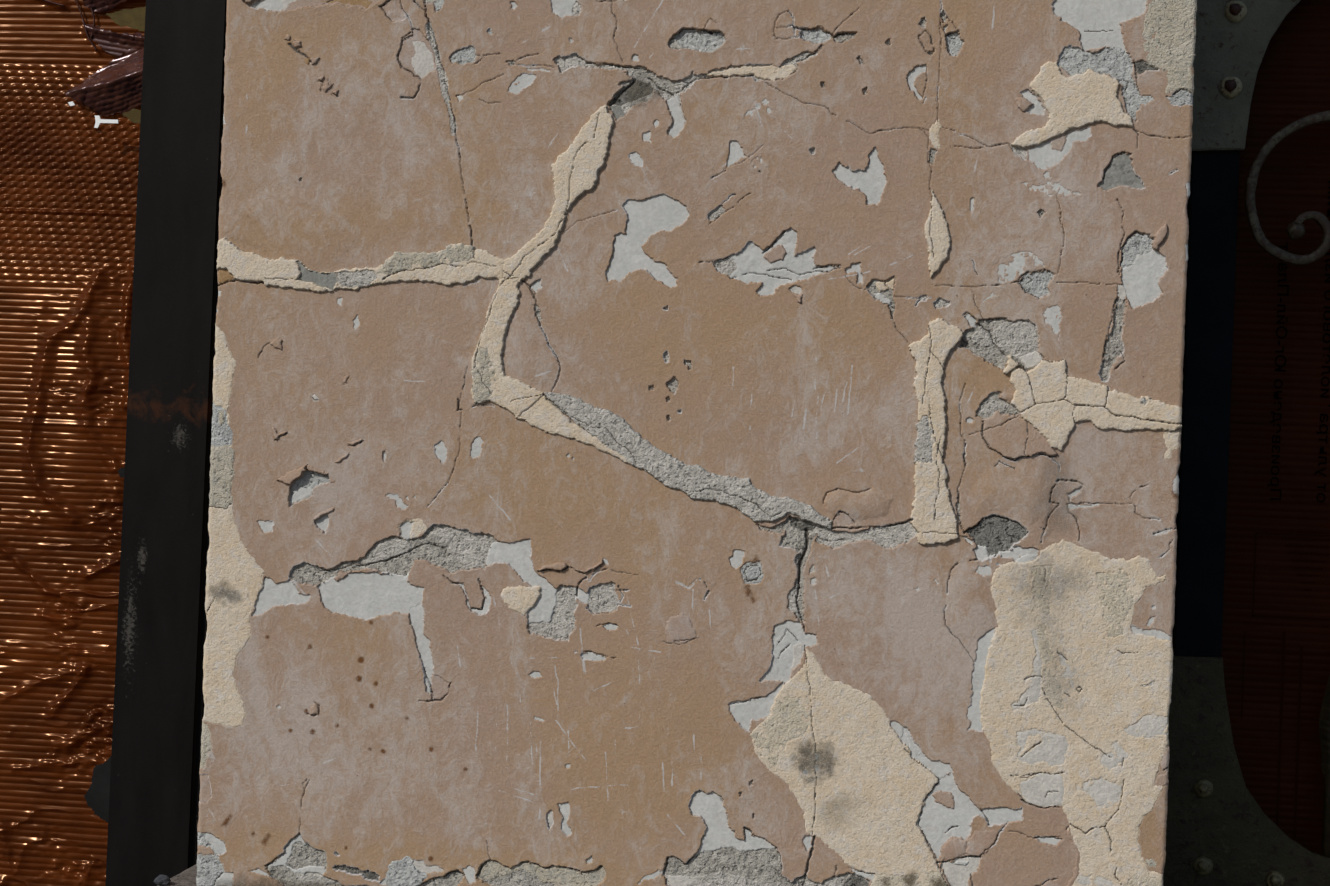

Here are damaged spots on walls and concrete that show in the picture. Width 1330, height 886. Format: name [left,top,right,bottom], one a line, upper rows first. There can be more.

crack [217,0,868,530]
peeling [606,195,690,288]
peeling [699,228,895,316]
crack [767,4,1009,194]
crack [1056,195,1125,285]
spalling [1009,0,1197,197]
crack [1133,129,1185,174]
spalling [199,290,638,803]
crack [845,260,1019,545]
crack [1003,355,1182,557]
spalling [638,510,1173,886]
spalling [251,834,606,886]